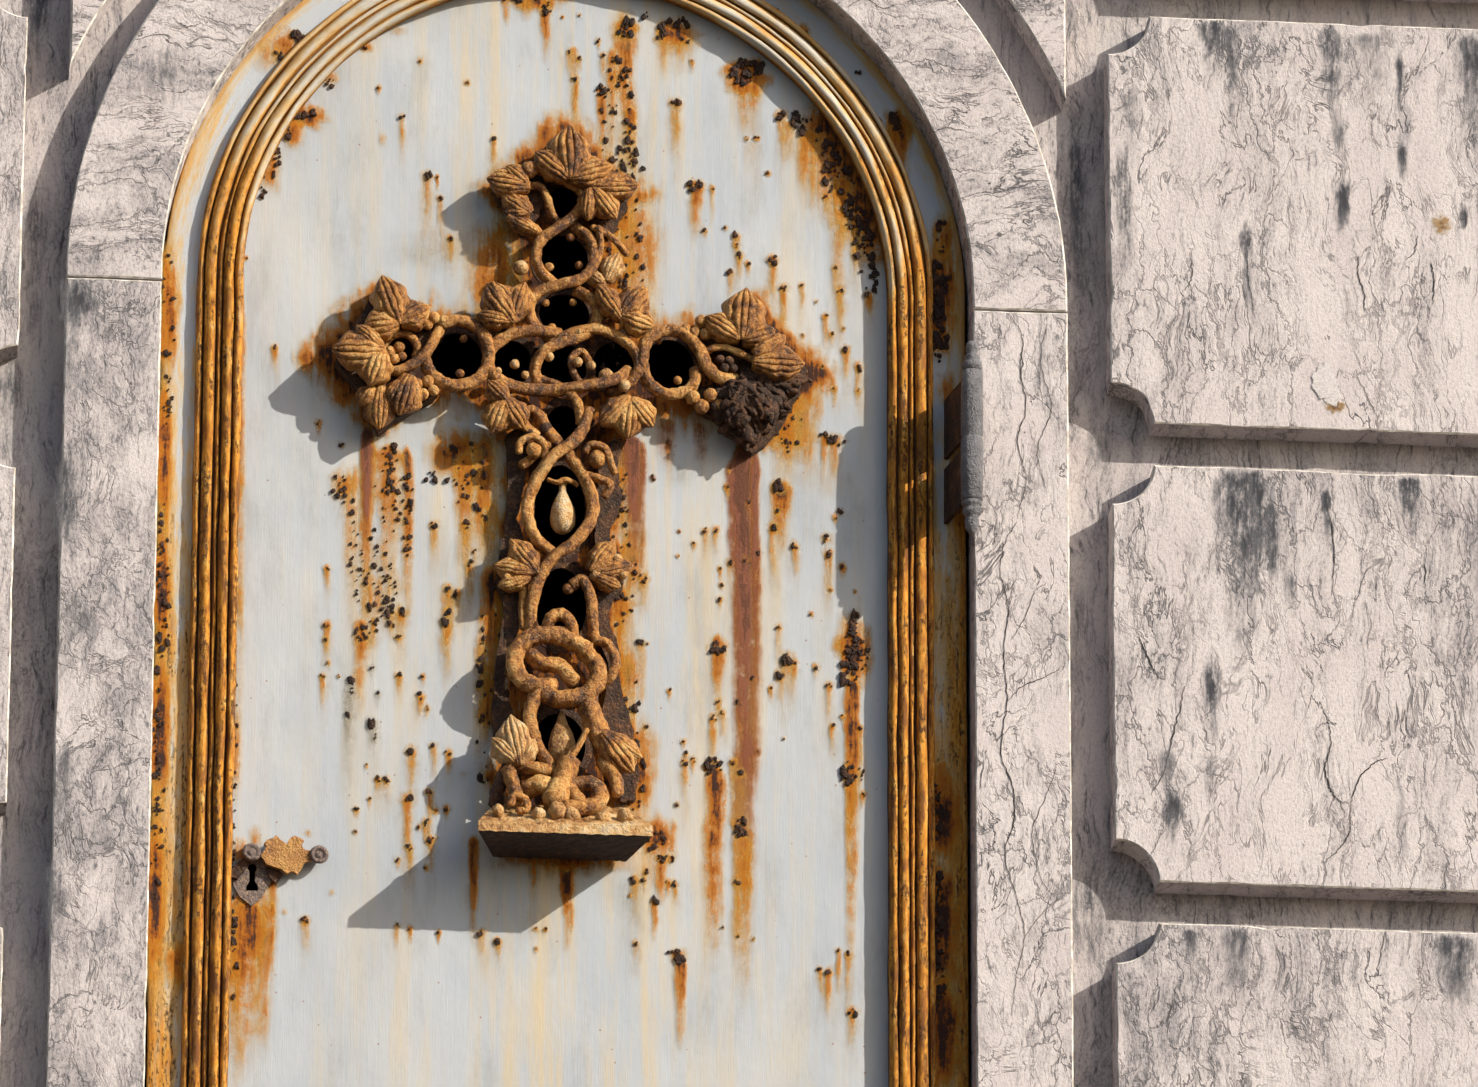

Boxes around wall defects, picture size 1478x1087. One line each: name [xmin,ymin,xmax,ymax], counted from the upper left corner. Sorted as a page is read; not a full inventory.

corrosion [502,0,581,45]
corrosion [723,57,773,109]
corrosion [424,170,443,213]
corrosion [430,12,696,347]
corrosion [931,219,958,401]
corrosion [147,252,183,986]
corrosion [298,282,736,929]
corrosion [677,104,883,1000]
corrosion [229,881,309,1050]
corrosion [468,836,501,952]
corrosion [667,948,687,1037]
corrosion [935,761,963,1087]